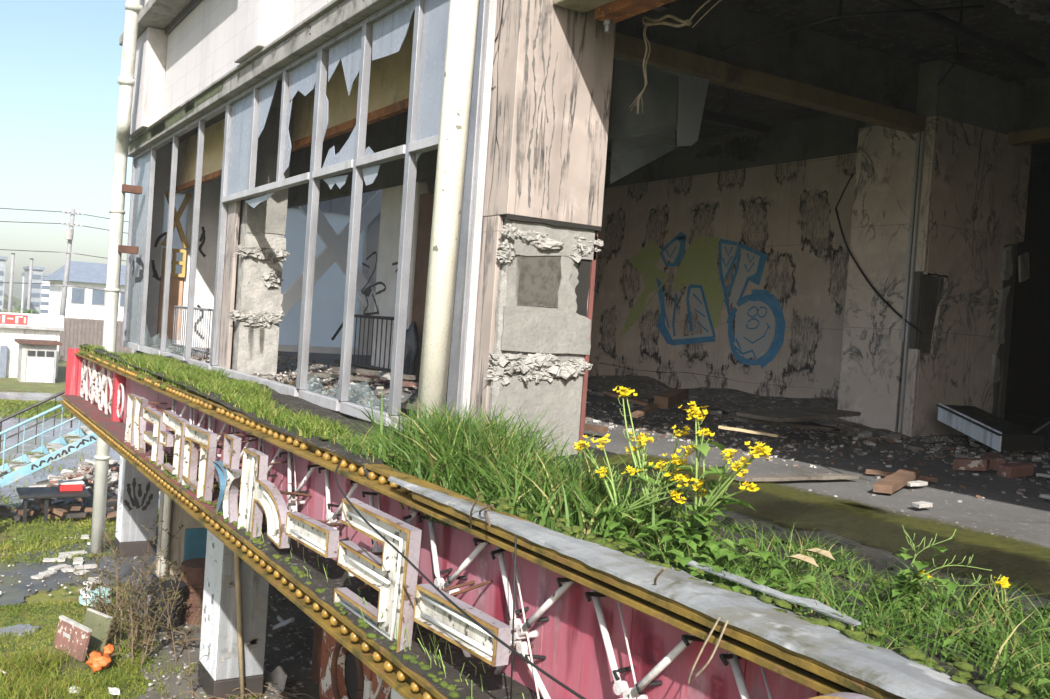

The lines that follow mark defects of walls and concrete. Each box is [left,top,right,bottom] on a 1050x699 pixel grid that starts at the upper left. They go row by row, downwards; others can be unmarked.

leakage [516,0,566,219]
spalling [228,107,293,375]
spalling [484,214,604,457]
leakage [594,462,1050,596]
spalling [725,517,946,593]
spalling [957,579,1050,624]